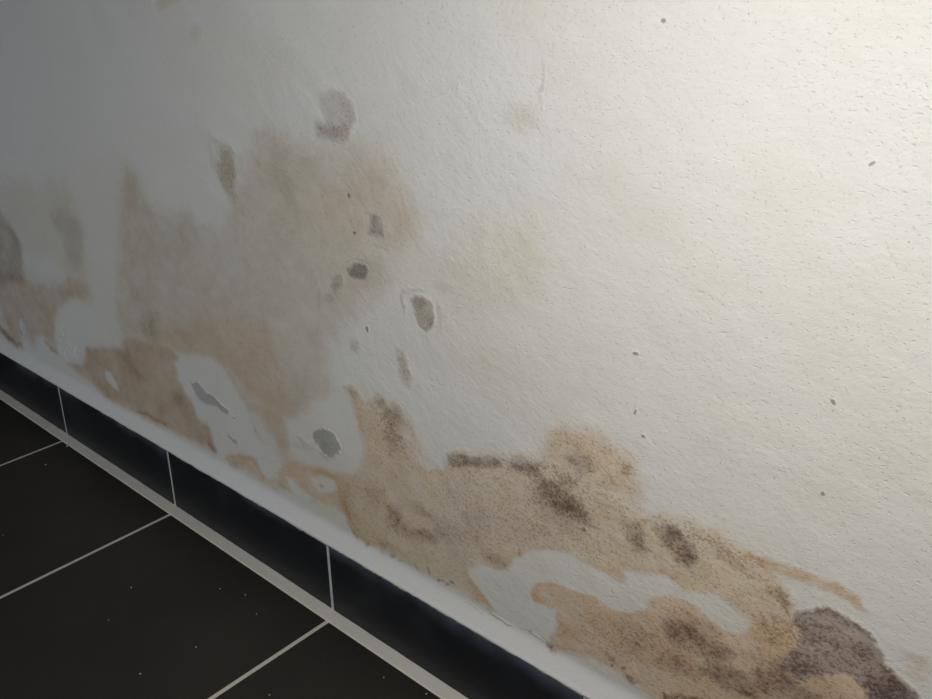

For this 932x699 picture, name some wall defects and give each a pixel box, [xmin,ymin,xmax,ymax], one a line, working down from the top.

damp [0,161,99,362]
peeling [190,379,240,420]
damp [65,84,449,519]
peeling [292,426,346,463]
damp [431,191,565,336]
damp [336,381,932,699]